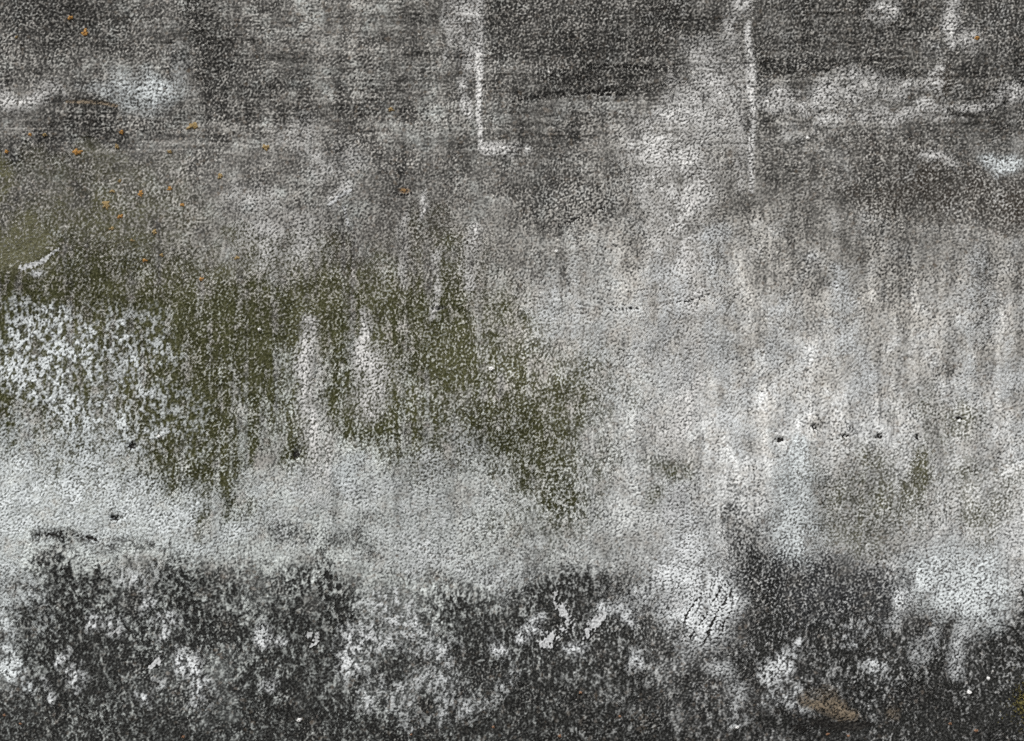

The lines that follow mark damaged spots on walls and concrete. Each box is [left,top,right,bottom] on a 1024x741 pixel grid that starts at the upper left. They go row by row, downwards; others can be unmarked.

leakage [465,223,480,252]
leakage [539,287,596,346]
leakage [0,288,1024,741]